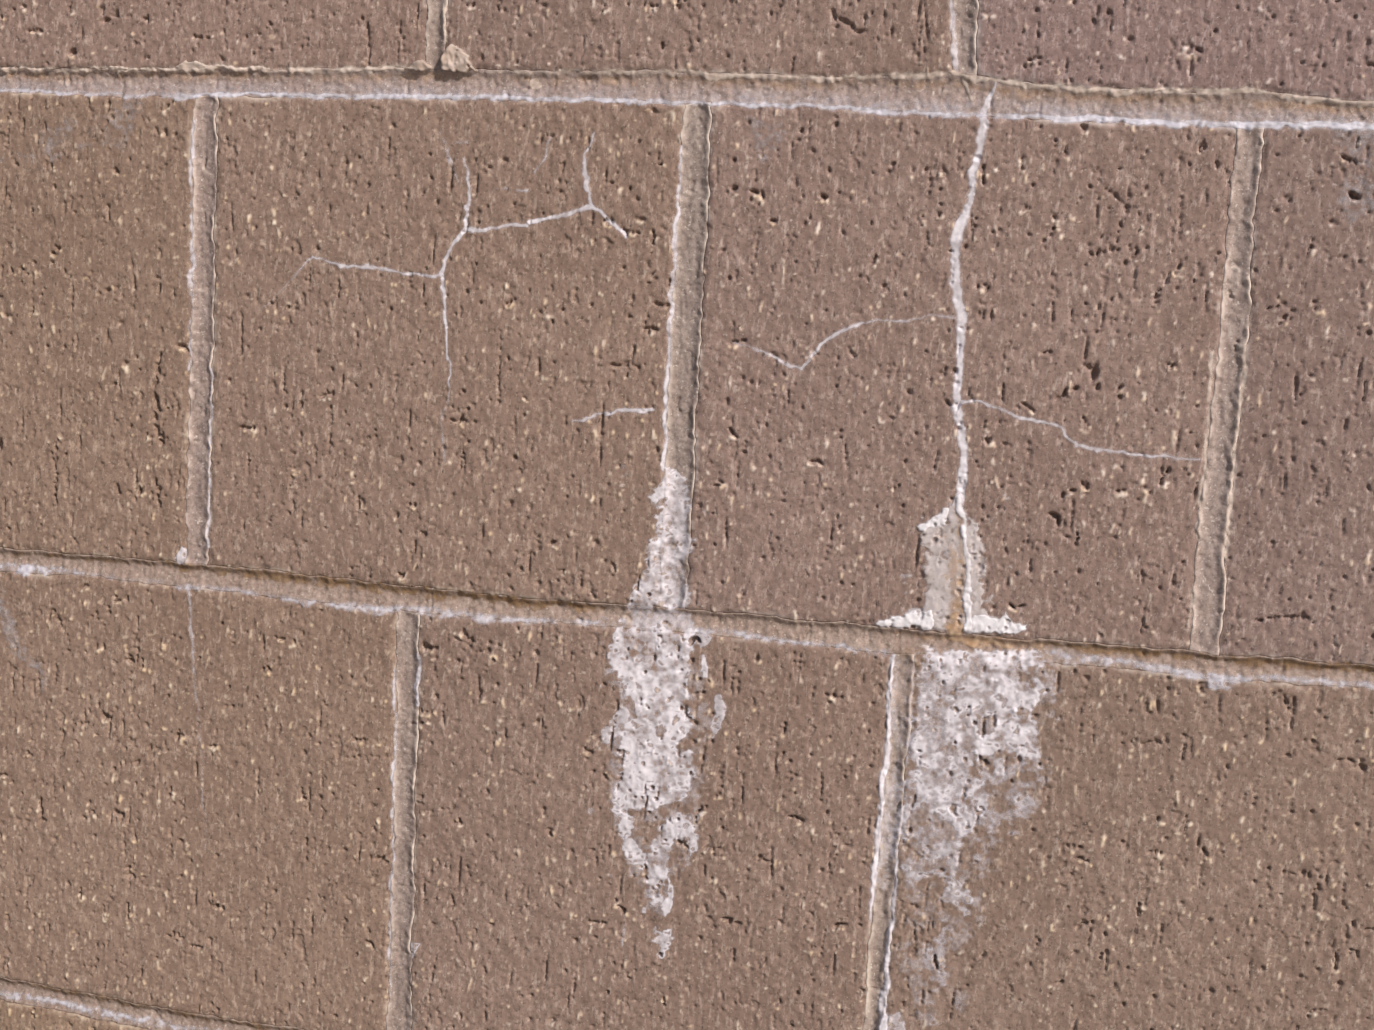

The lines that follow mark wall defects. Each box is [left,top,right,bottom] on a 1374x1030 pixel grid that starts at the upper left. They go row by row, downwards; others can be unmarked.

leakage [166,546,604,624]
crack [300,134,627,385]
crack [581,408,654,422]
leakage [601,146,711,959]
crack [760,320,903,370]
crack [949,82,1194,506]
leakage [1195,351,1214,555]
leakage [1220,323,1250,610]
leakage [387,731,396,957]
leakage [710,695,726,734]
leakage [869,494,1374,1030]